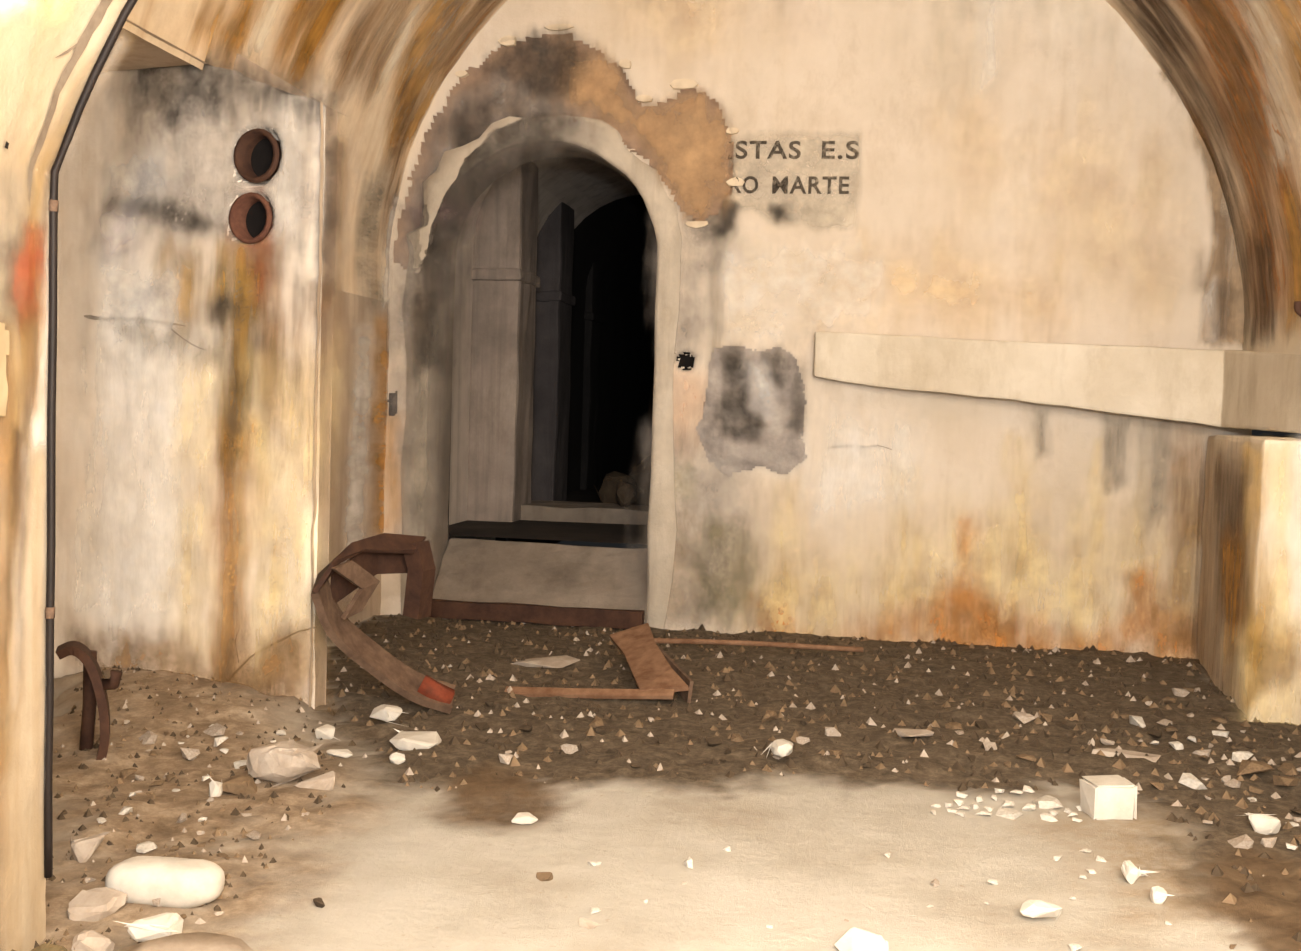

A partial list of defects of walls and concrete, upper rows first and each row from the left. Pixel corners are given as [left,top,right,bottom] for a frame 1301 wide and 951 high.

water stain [138,0,343,121]
water stain [106,174,207,235]
flaking render [393,24,744,269]
water stain [1122,0,1301,344]
flaking render [0,322,10,416]
water stain [77,245,299,694]
corrosion [760,609,789,633]